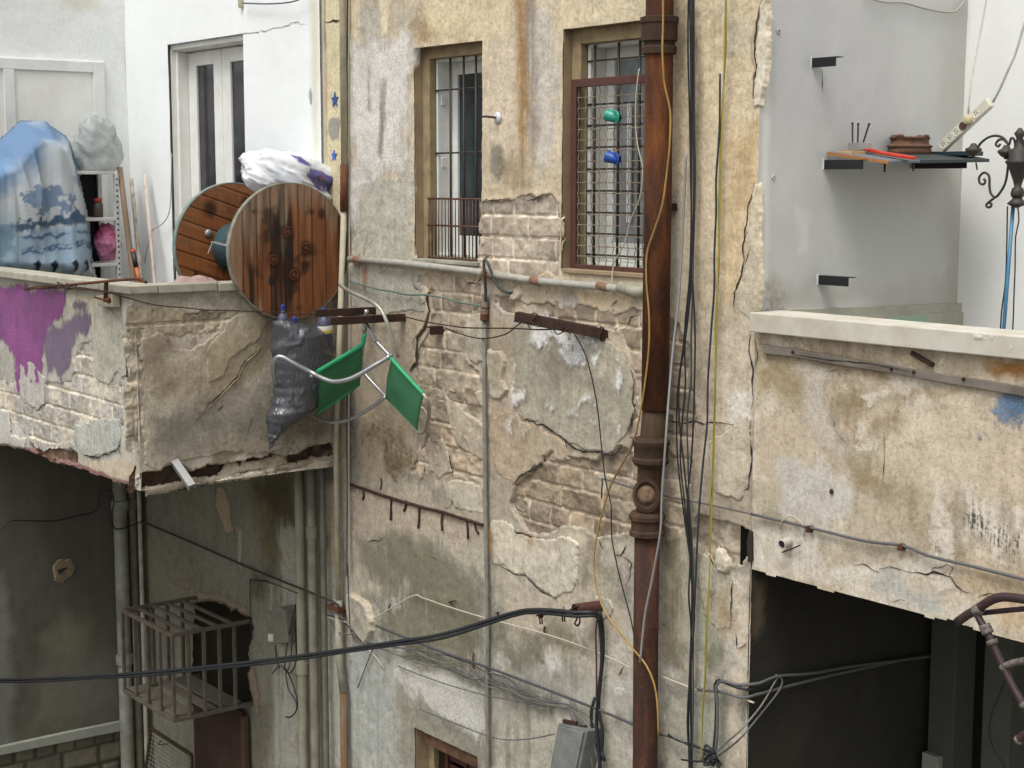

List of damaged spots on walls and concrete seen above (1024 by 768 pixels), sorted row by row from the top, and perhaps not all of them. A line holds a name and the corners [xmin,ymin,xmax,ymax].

crack [750,0,762,99]
crack [733,183,754,311]
peeling [0,303,337,497]
crack [196,346,261,418]
crack [409,283,433,370]
spalling [350,194,642,598]
crack [520,368,635,456]
spalling [660,318,741,630]
leakage [361,535,632,741]
crack [860,564,992,598]